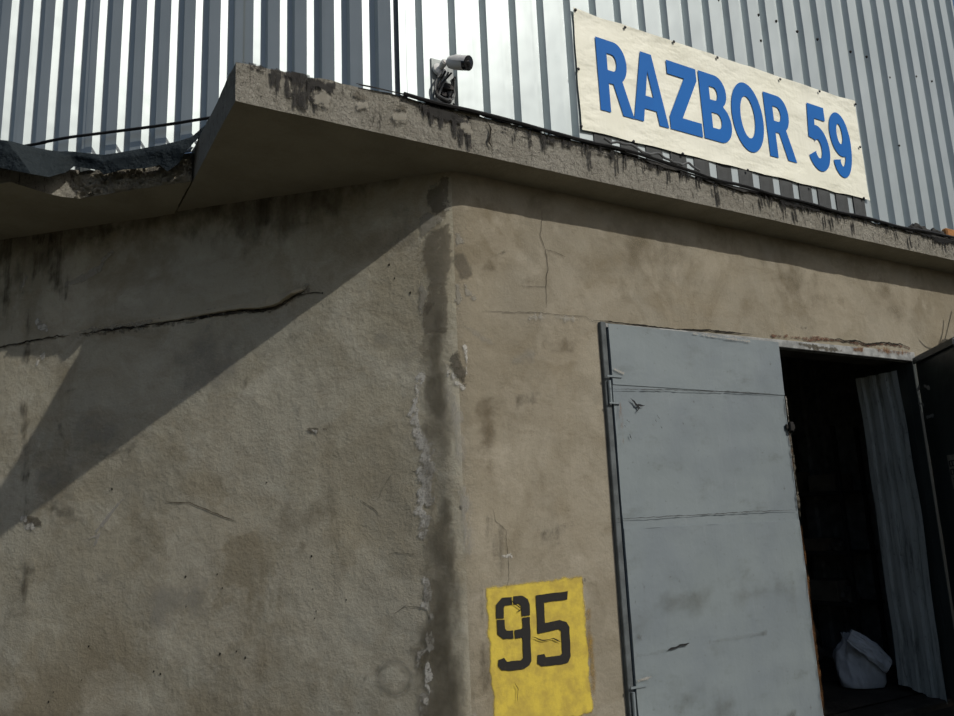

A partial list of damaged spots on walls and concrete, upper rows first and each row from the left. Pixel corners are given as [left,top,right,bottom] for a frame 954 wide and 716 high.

crack [0,284,320,348]
damp [408,372,437,539]
damp [416,631,434,716]